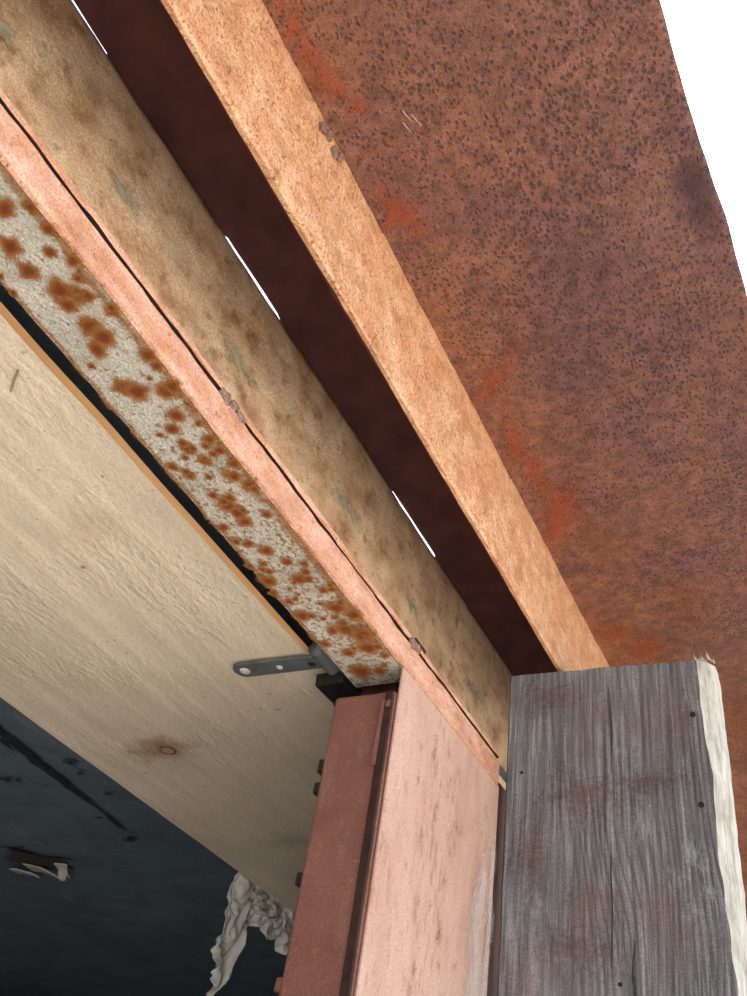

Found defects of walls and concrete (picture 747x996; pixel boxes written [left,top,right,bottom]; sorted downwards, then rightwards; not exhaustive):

rust [0,162,395,680]
crack [606,687,614,774]
peeling [2,849,70,882]
crack [610,855,637,996]